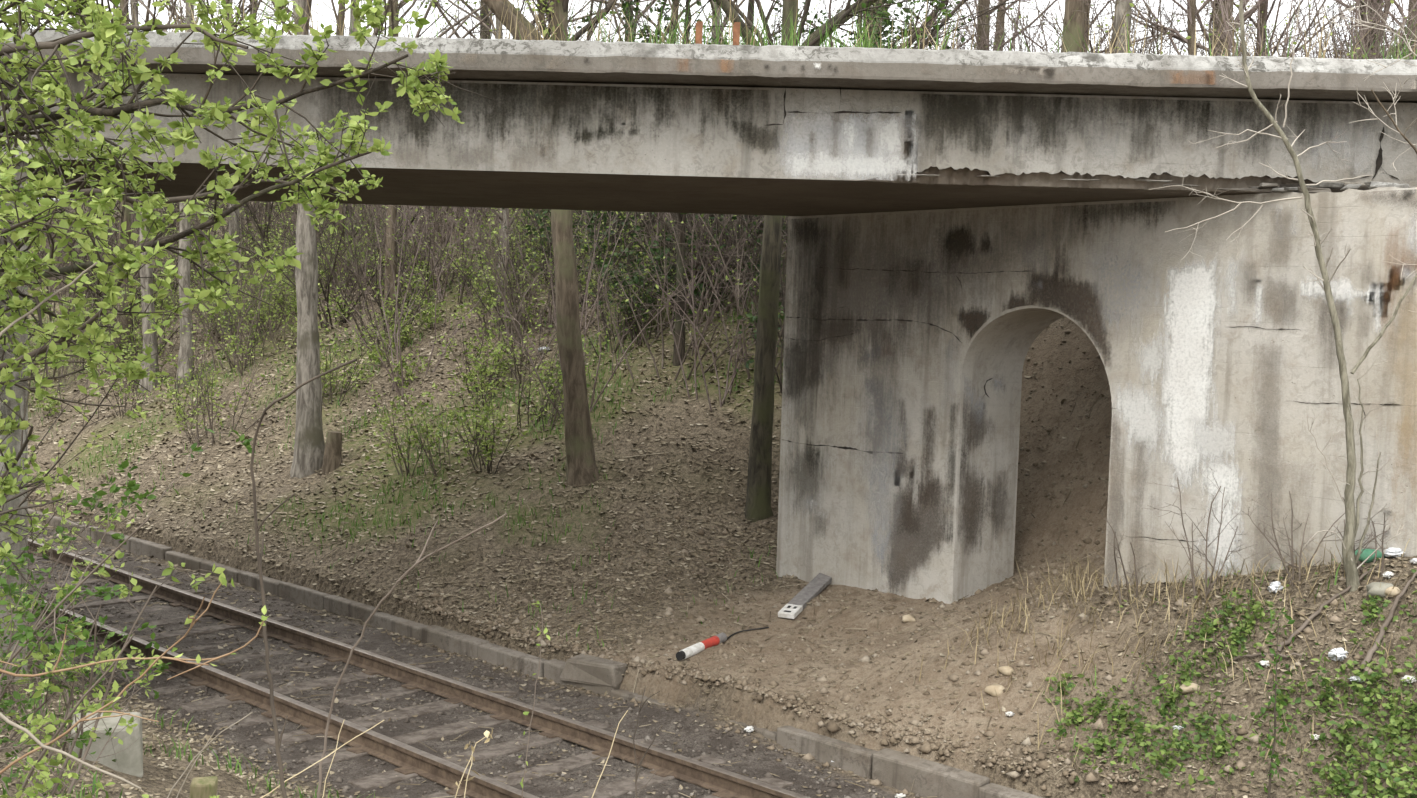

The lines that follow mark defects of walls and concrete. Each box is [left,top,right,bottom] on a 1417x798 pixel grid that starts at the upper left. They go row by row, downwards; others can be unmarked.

water stain [336,80,669,142]
water stain [743,109,916,180]
spalling [861,166,1417,203]
water stain [944,227,992,256]
water stain [959,246,1110,364]
water stain [889,409,984,587]